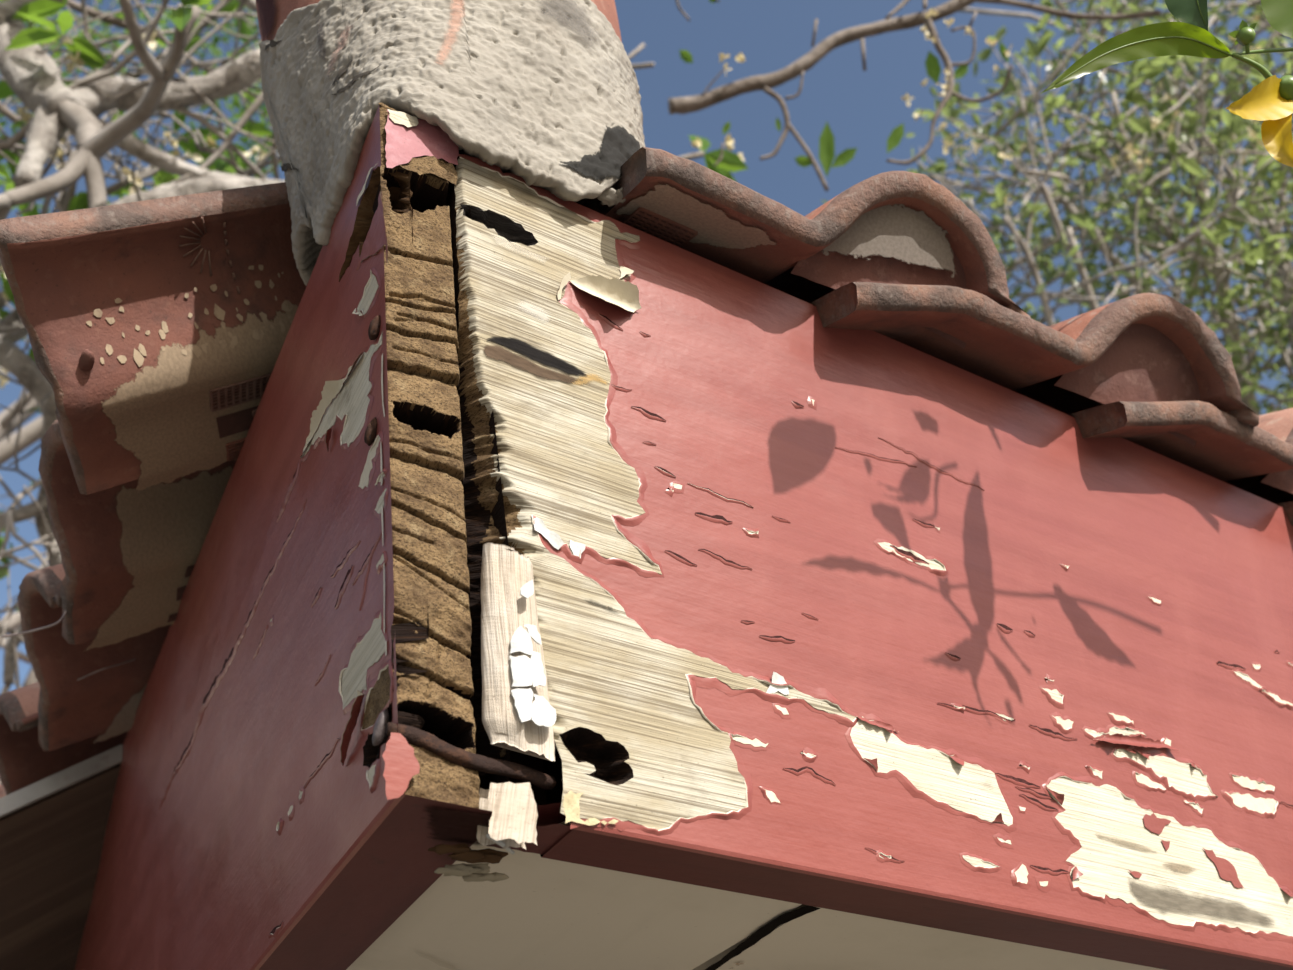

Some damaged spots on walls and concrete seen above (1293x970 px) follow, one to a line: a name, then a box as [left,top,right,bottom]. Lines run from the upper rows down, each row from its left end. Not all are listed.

peeling [352,161,388,319]
peeling [300,328,389,519]
crack [159,458,307,810]
crack [303,738,340,789]
crack [311,533,382,611]
peeling [339,604,394,766]
peeling [366,759,380,794]
peeling [446,154,1051,892]
peeling [1146,594,1162,606]
peeling [1039,674,1293,944]
peeling [1231,662,1293,710]